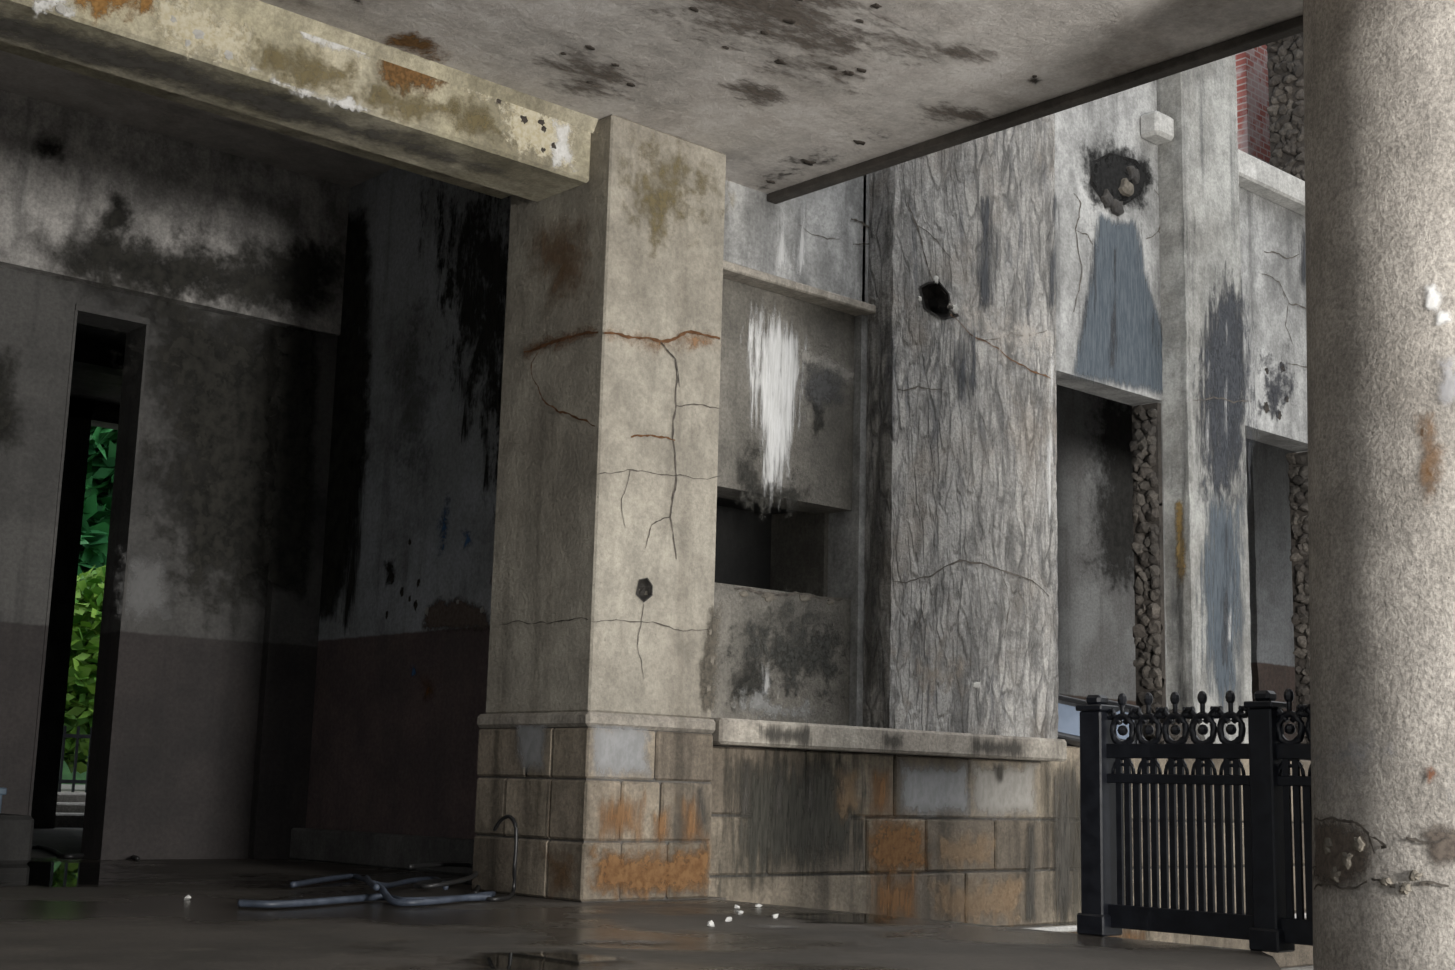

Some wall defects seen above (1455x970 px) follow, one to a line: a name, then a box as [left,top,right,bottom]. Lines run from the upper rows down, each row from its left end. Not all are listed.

rust [75,0,153,20]
rust [366,33,459,122]
leakage [53,193,371,631]
crack [524,329,720,559]
leakage [739,303,887,515]
hole [918,276,959,320]
crack [951,197,1093,379]
leakage [1075,140,1163,589]
leakage [1177,263,1295,708]
crack [893,559,1049,638]
rust [592,800,710,898]
spalling [1313,816,1375,890]